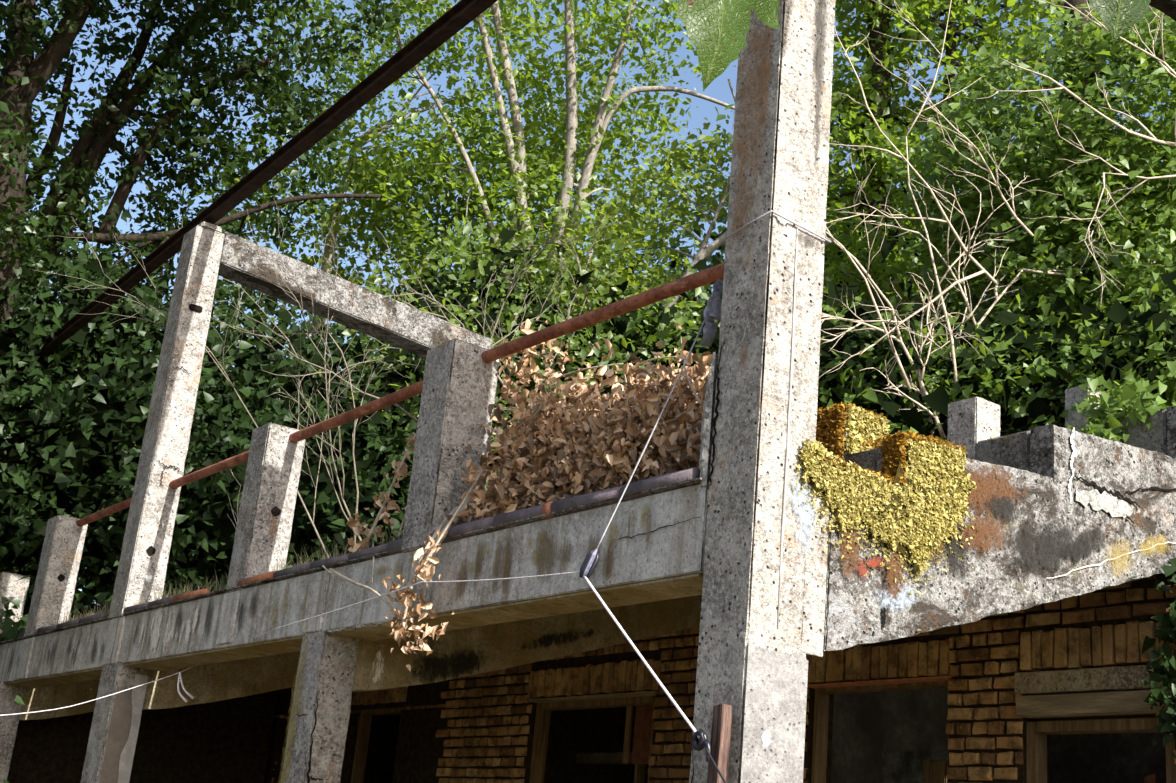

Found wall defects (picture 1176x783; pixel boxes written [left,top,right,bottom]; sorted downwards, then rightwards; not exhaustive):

crack [1052,428,1176,578]
damp [944,519,968,577]
damp [982,495,1105,575]
damp [90,629,104,663]
damp [133,599,213,654]
damp [236,594,256,632]